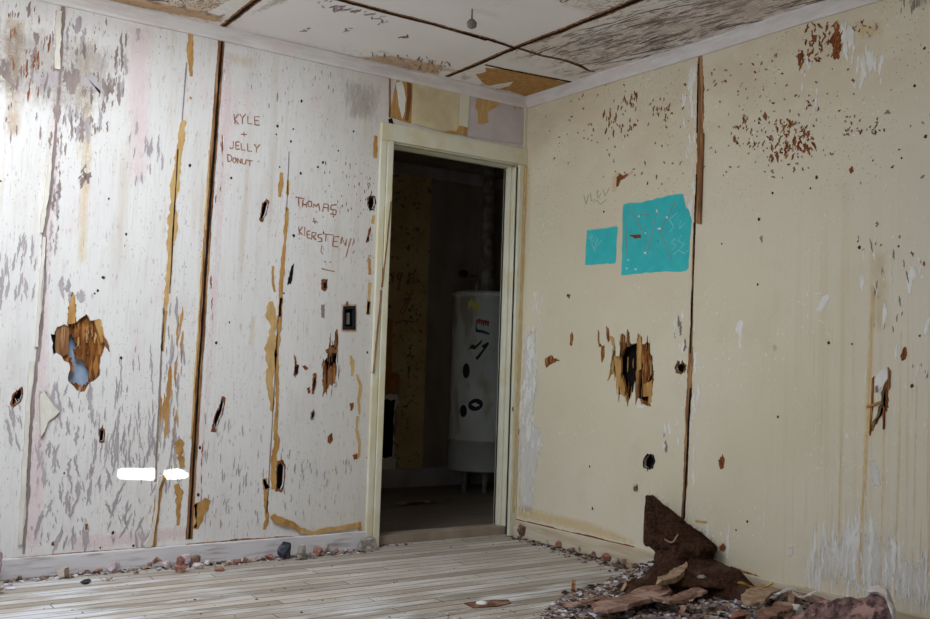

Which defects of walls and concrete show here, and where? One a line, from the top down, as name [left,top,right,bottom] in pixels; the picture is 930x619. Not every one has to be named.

peeling [145,0,245,18]
peeling [531,0,825,69]
spalling [728,19,891,179]
peeling [278,172,289,197]
peeling [31,120,187,554]
peeling [193,207,362,530]
peeling [874,368,888,393]